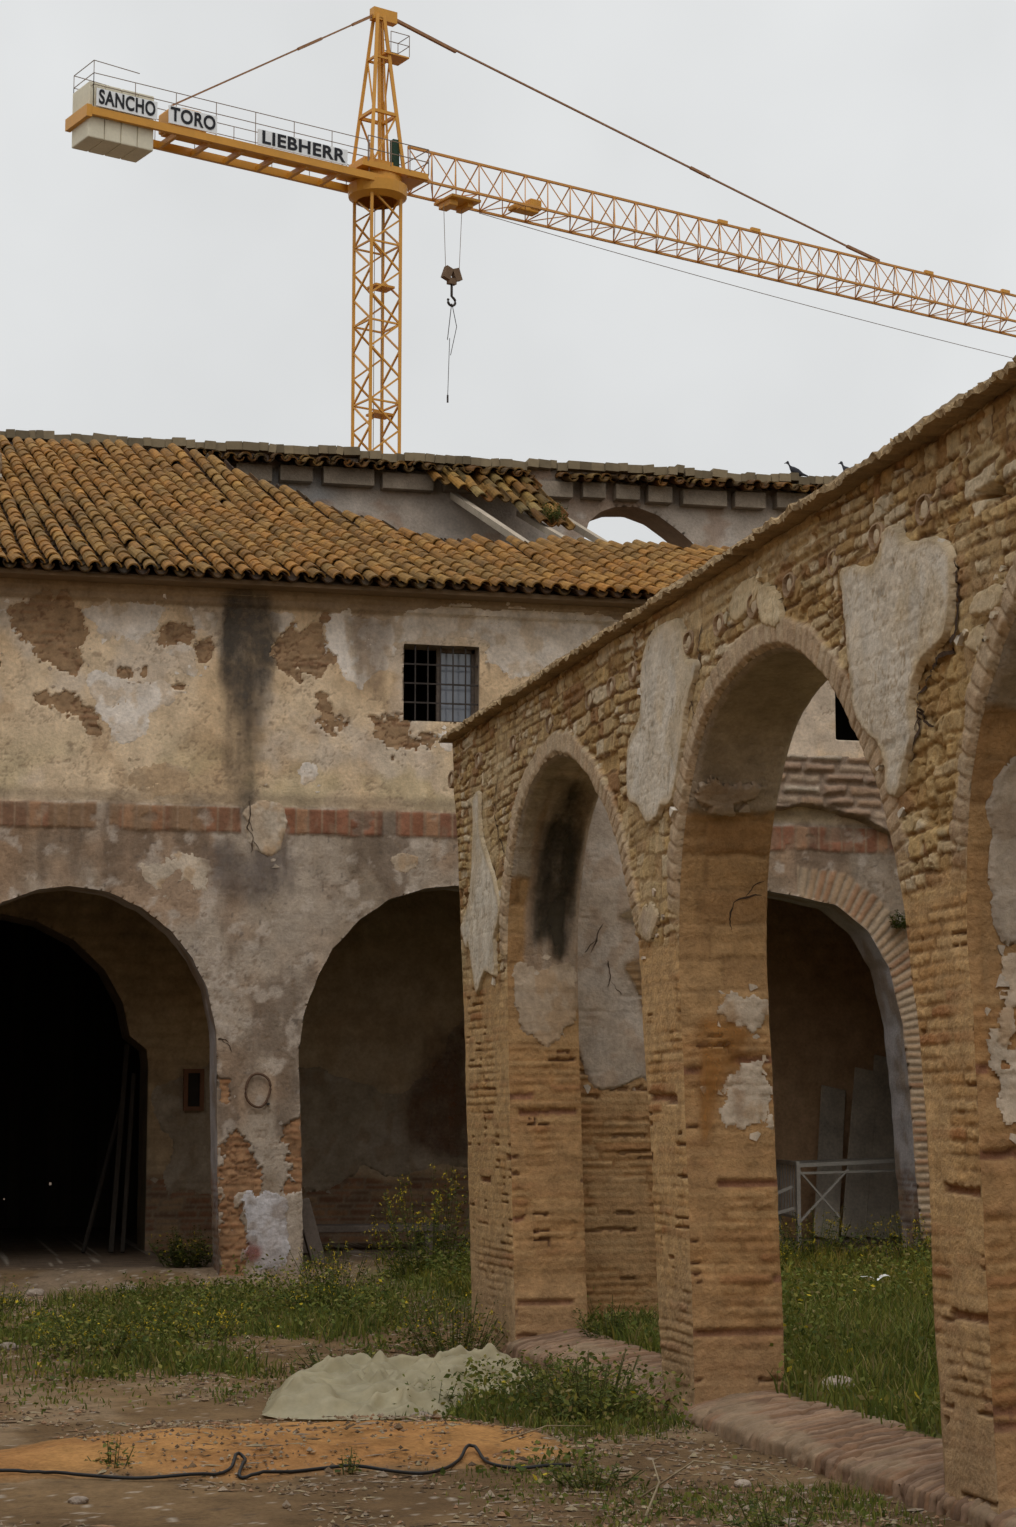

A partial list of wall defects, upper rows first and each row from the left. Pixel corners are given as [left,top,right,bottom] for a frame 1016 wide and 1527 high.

spalling [0,590,218,805]
leakage [220,591,277,730]
spalling [370,712,453,760]
peeling [268,602,619,737]
leakage [534,783,582,959]
peeling [985,756,1016,1144]
peeling [150,1018,468,1276]
peeling [700,984,774,1141]